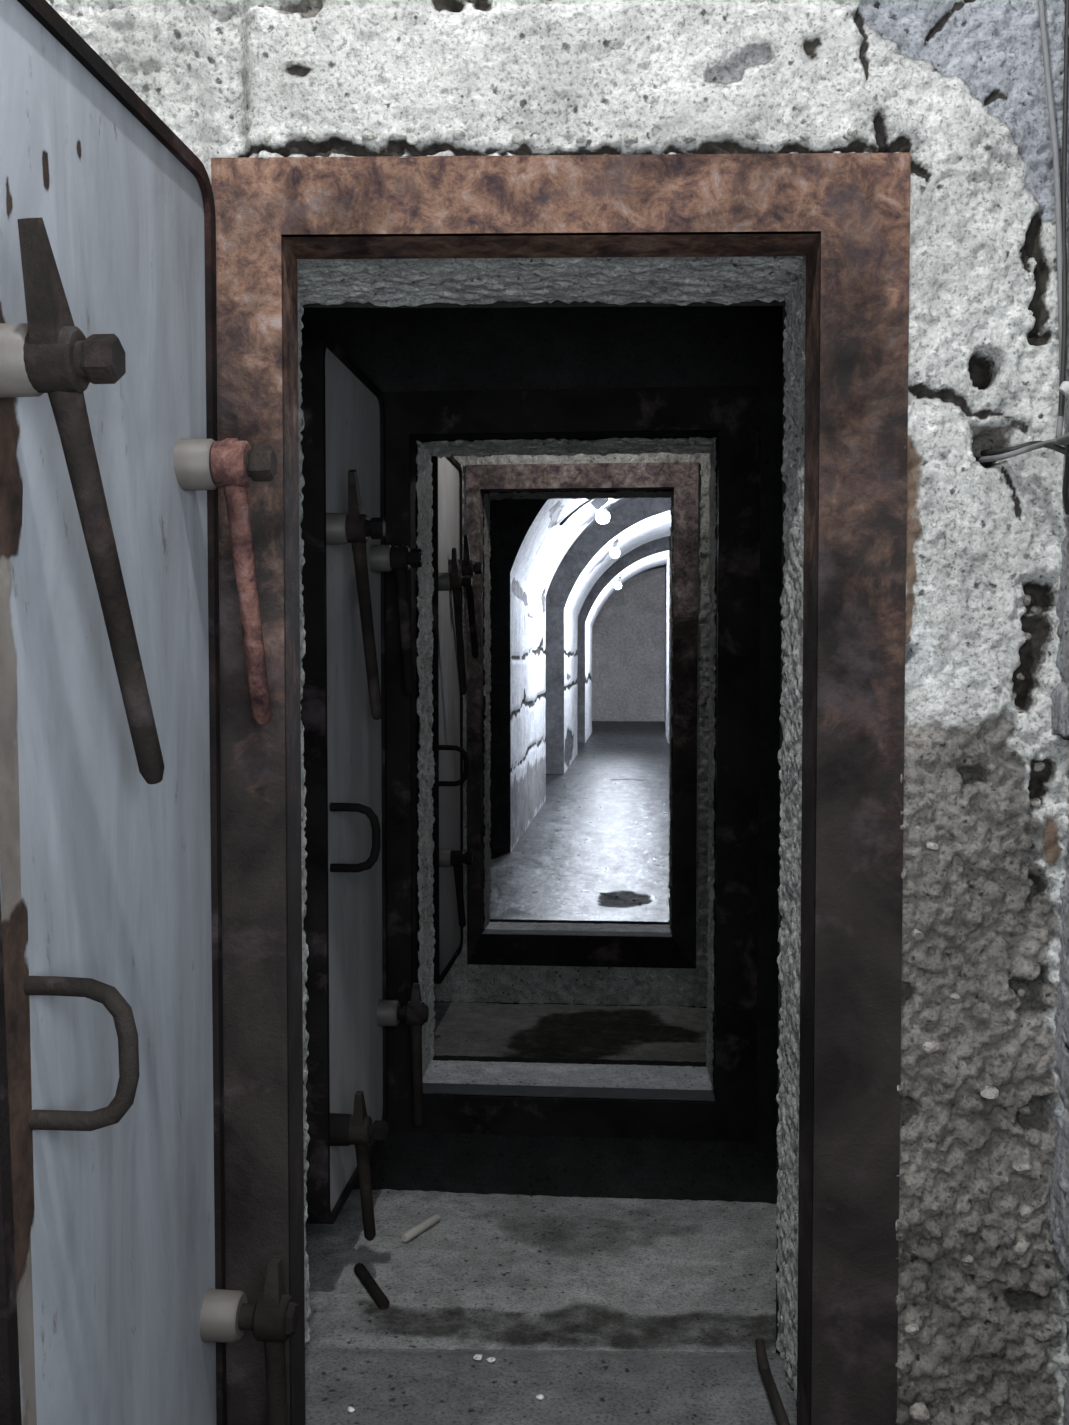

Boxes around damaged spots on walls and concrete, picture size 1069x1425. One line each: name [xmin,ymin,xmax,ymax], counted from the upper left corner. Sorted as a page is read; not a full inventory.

spalling [984,89,1008,106]
water stain [506,1009,701,1059]